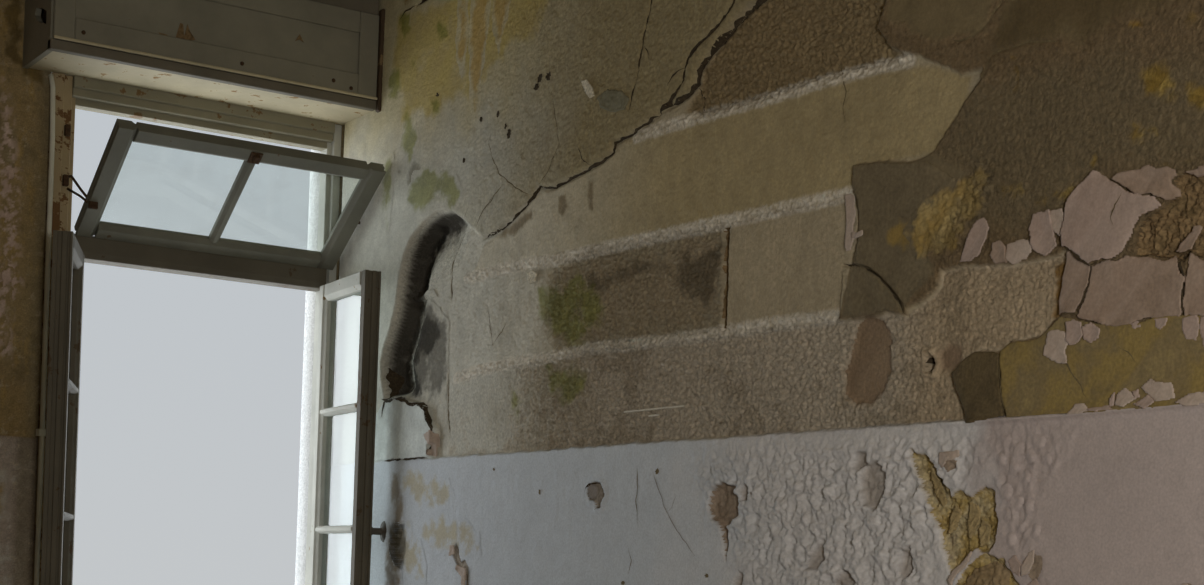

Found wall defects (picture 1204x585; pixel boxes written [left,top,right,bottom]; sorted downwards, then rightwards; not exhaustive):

peeling [0,68,26,368]
crack [451,0,767,295]
spalling [381,0,1204,456]
peeling [584,482,604,510]
spalling [708,482,748,556]
spalling [912,450,1043,585]